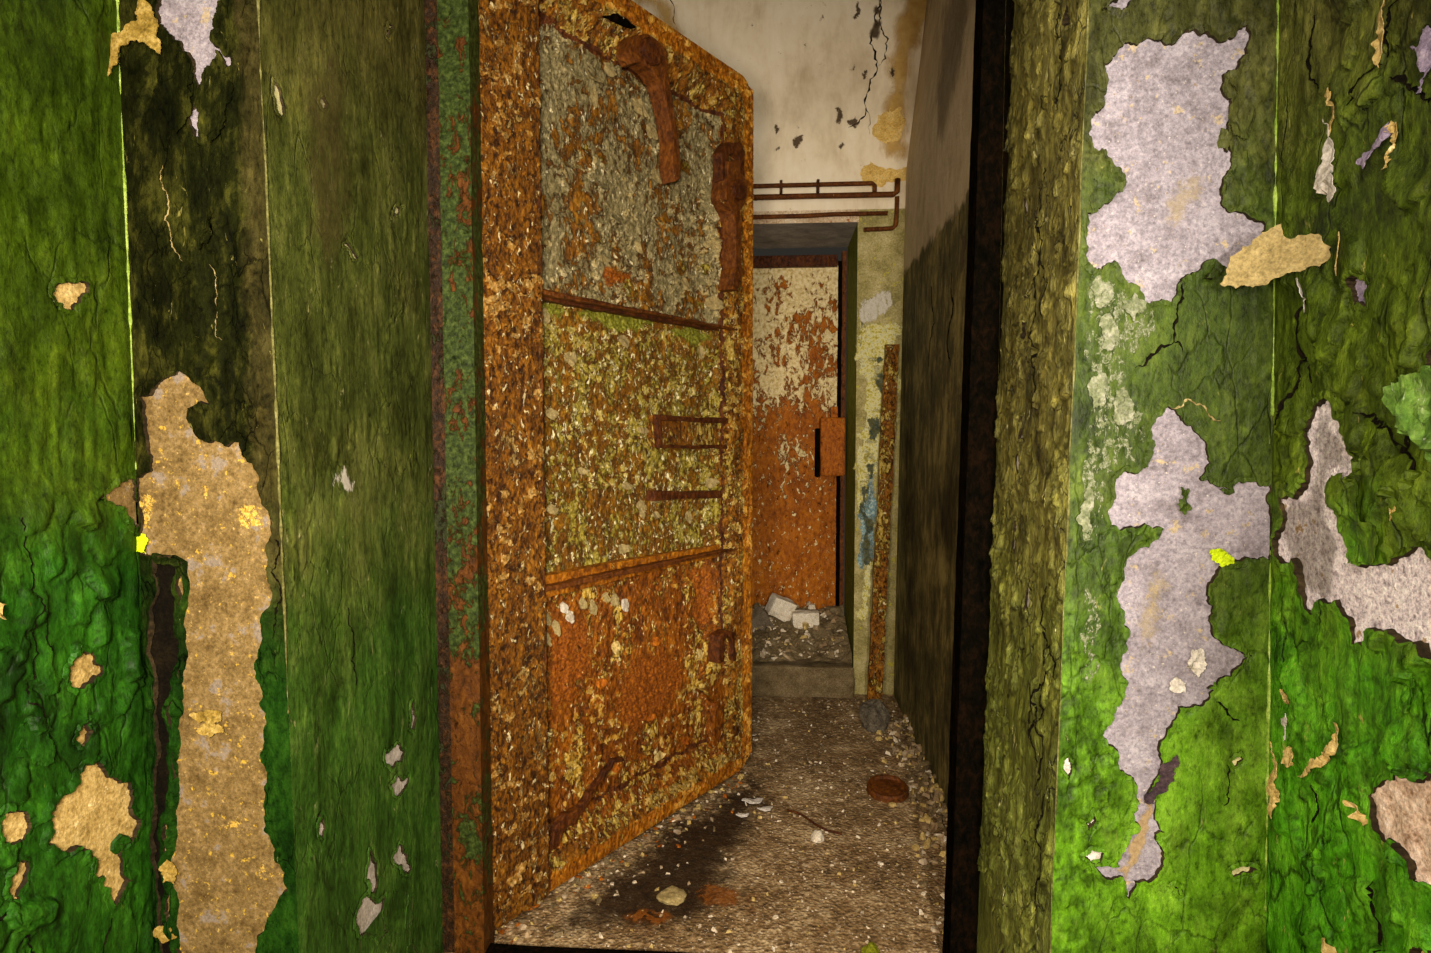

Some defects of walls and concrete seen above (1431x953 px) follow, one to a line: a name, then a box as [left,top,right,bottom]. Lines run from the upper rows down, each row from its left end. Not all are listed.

peeling [107,0,236,146]
crack [848,0,889,129]
corrosion [603,267,632,288]
peeling [0,64,295,953]
peeling [1049,0,1431,953]
corrosion [547,613,595,721]
corrosion [615,645,685,738]